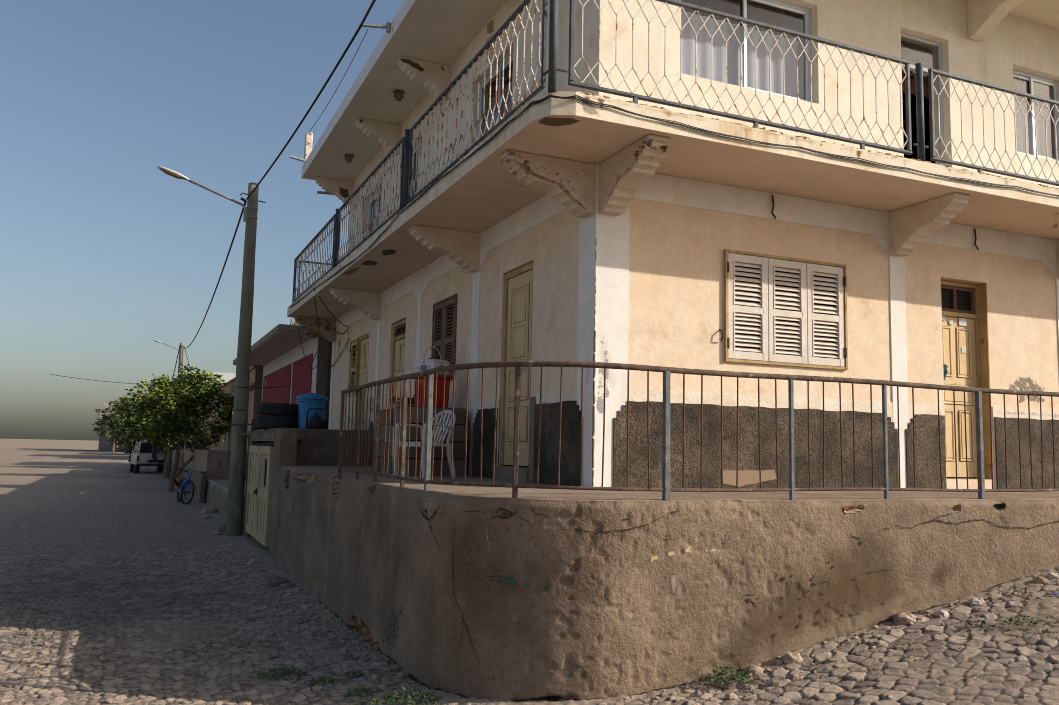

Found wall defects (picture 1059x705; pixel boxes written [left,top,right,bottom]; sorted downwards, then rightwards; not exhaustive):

crack [590,239,598,486]
peeling [597,341,609,413]
crack [849,511,1059,539]
crack [418,495,681,663]
crack [974,576,1025,596]
crack [587,569,947,700]
crack [384,654,482,699]